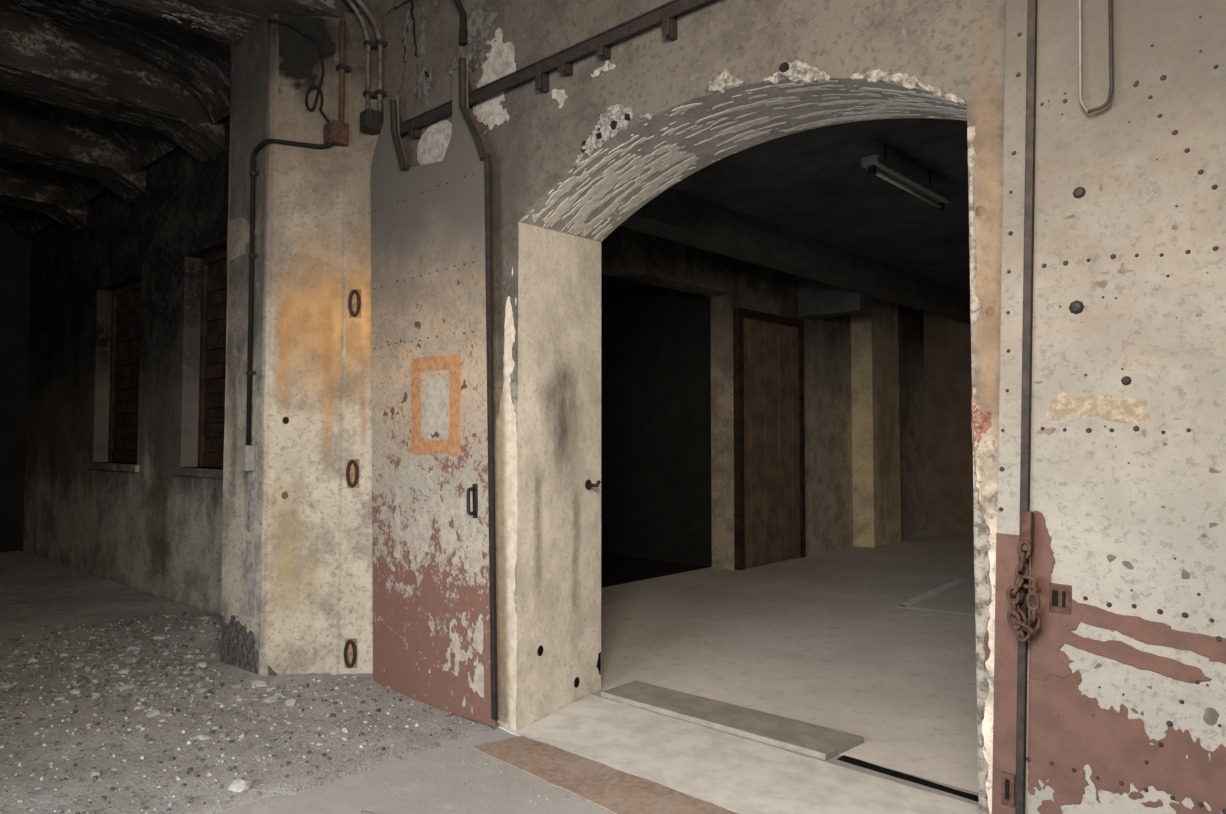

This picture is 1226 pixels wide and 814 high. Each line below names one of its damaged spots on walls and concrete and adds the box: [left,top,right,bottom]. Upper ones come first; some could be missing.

corrosion [282,270,371,385]
peeling [447,5,516,134]
peeling [521,58,982,323]
peeling [1095,263,1134,289]
peeling [376,296,517,730]
spalling [971,384,992,814]
peeling [1027,511,1226,814]